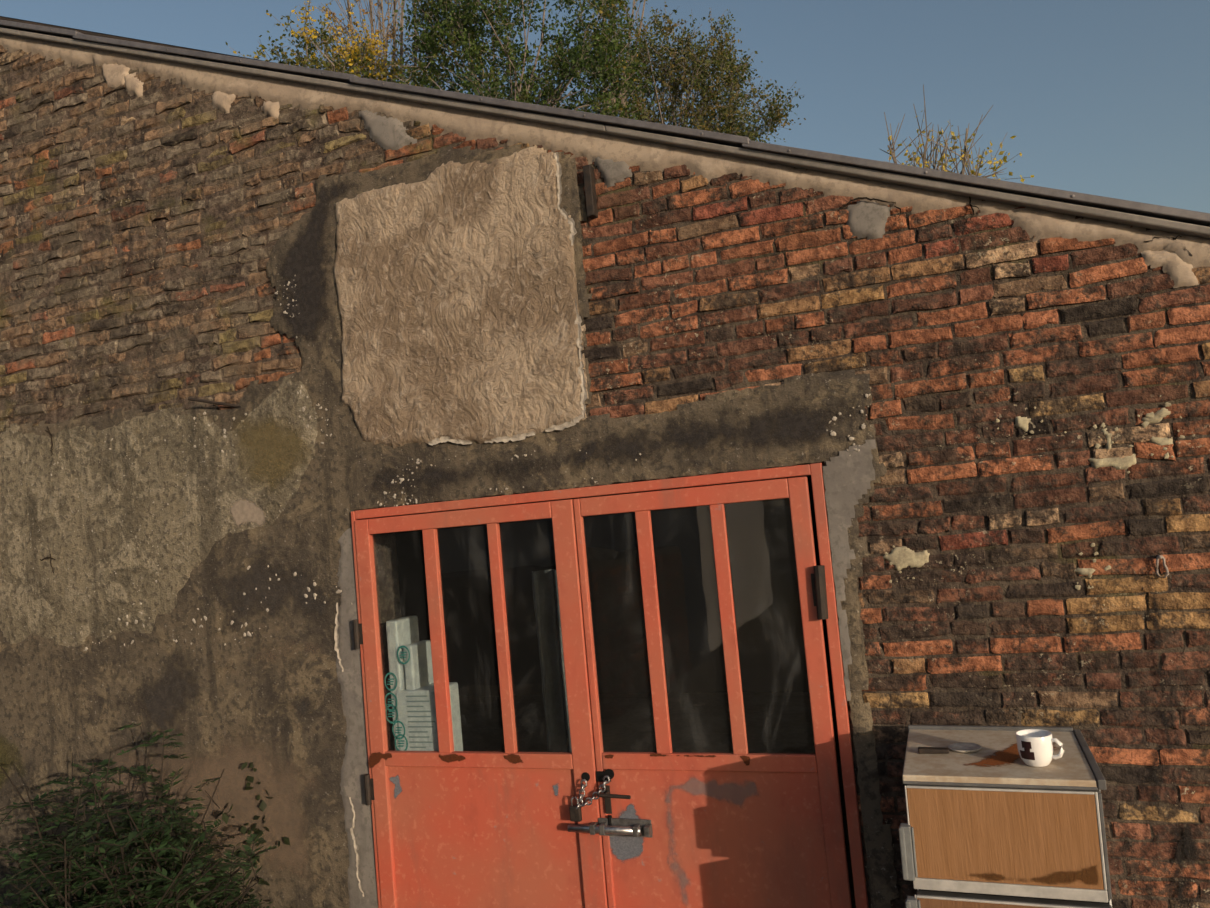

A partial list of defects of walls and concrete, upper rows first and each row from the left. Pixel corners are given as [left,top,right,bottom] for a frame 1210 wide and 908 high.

spalling [102,63,145,98]
spalling [212,91,236,114]
spalling [261,101,280,119]
peeling [359,110,417,150]
peeling [592,157,632,187]
peeling [554,152,577,246]
peeling [845,200,891,240]
peeling [1141,249,1199,288]
peeling [377,299,587,506]
damp [373,403,834,490]
peeling [666,778,757,833]